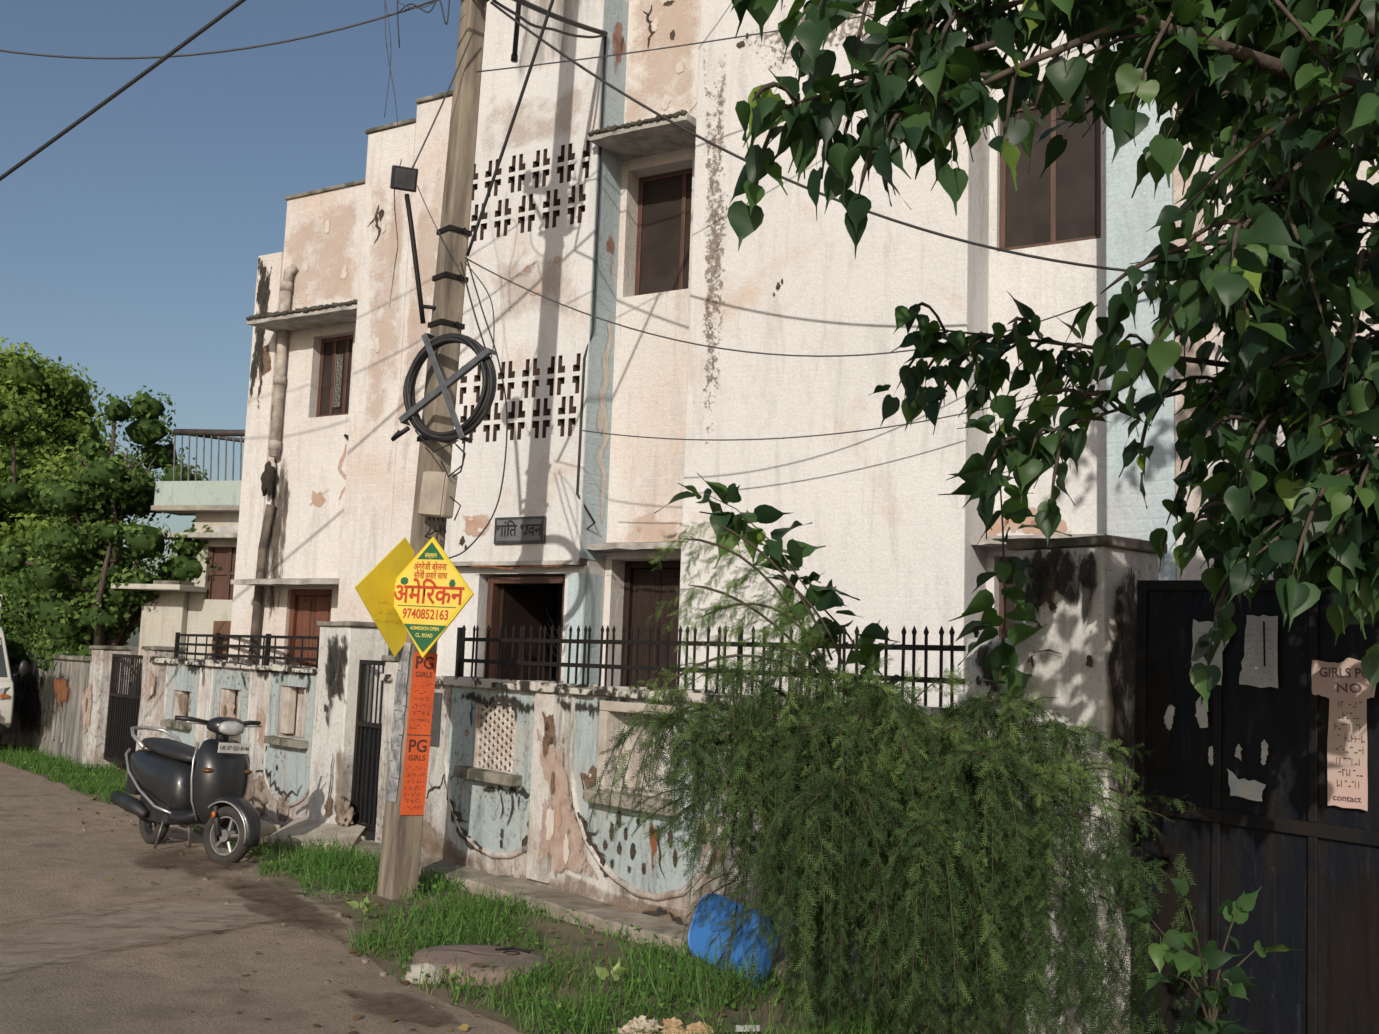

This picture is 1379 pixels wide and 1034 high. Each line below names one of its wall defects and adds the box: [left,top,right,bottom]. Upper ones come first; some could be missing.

leakage [249,257,272,408]
peeling [310,444,347,507]
leakage [267,459,289,614]
mould [1021,547,1097,623]
leakage [173,634,347,725]
peeling [522,711,646,878]
peeling [667,828,677,867]